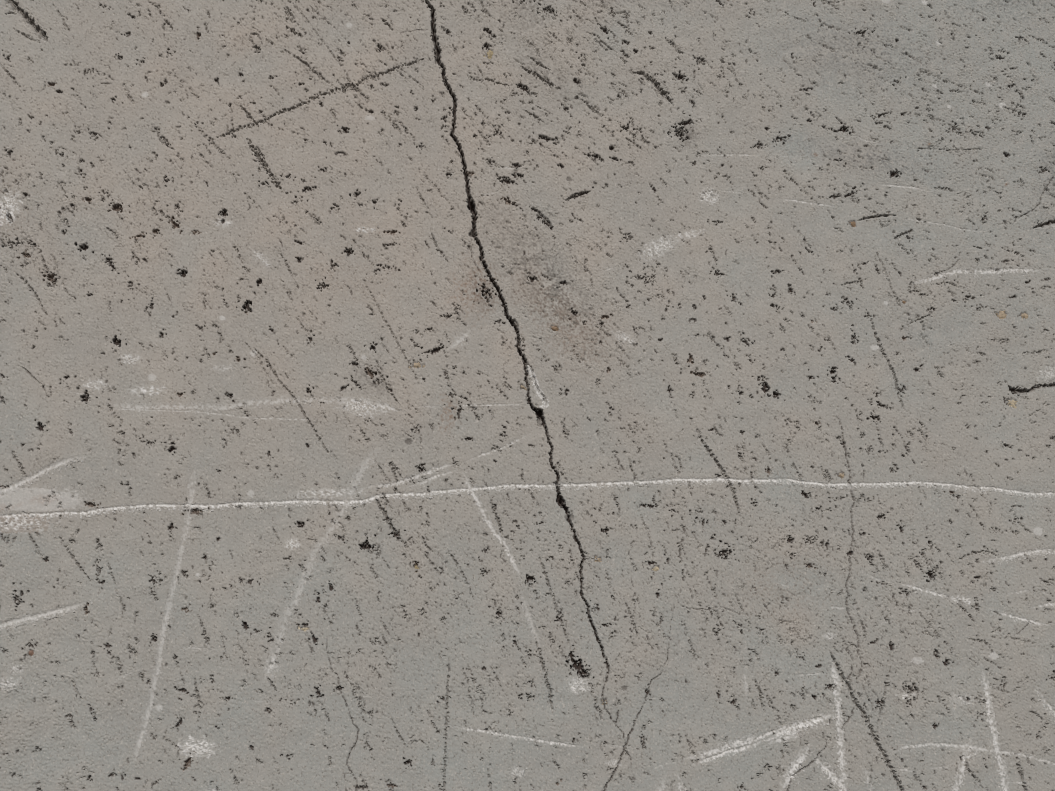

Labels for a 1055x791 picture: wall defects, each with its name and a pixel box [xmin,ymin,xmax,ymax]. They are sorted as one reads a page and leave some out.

crack [393,0,744,791]